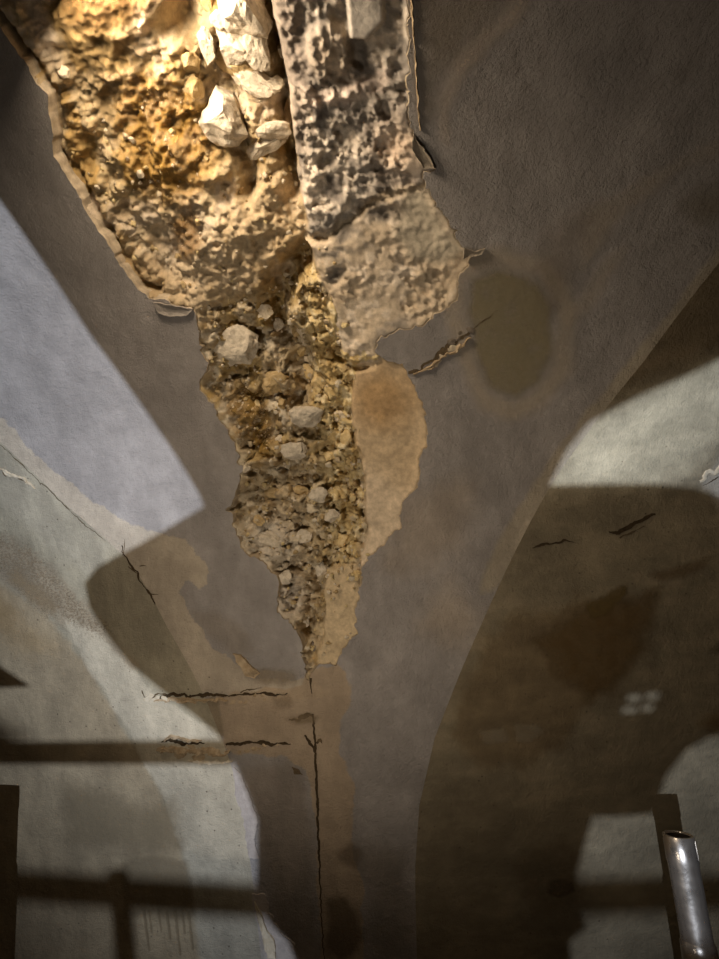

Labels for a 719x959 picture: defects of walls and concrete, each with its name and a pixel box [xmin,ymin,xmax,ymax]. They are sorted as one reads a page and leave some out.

spalling [0,0,485,682]
crack [408,310,497,375]
crack [0,445,158,604]
crack [699,466,719,486]
crack [142,678,325,959]